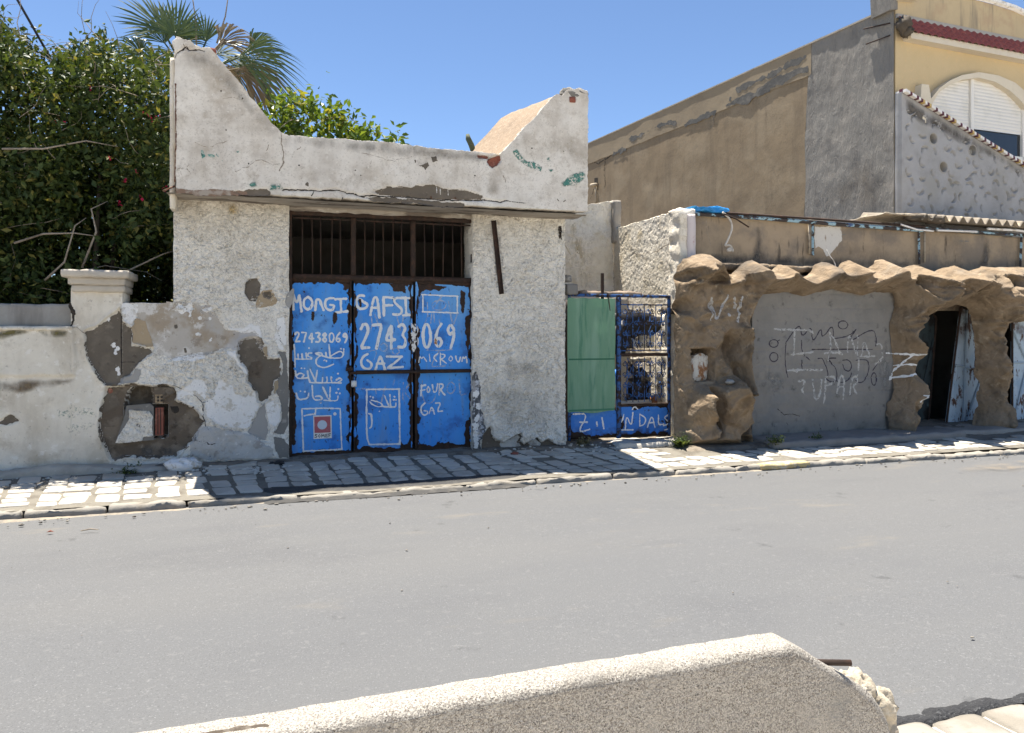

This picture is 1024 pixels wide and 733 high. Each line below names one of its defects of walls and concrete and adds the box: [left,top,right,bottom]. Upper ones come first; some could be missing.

crack [178,134,522,203]
spalling [362,184,483,208]
flaking render [478,155,501,168]
corrosion [491,220,504,294]
spalling [244,278,278,308]
peeling [84,301,289,461]
peeling [472,372,559,455]